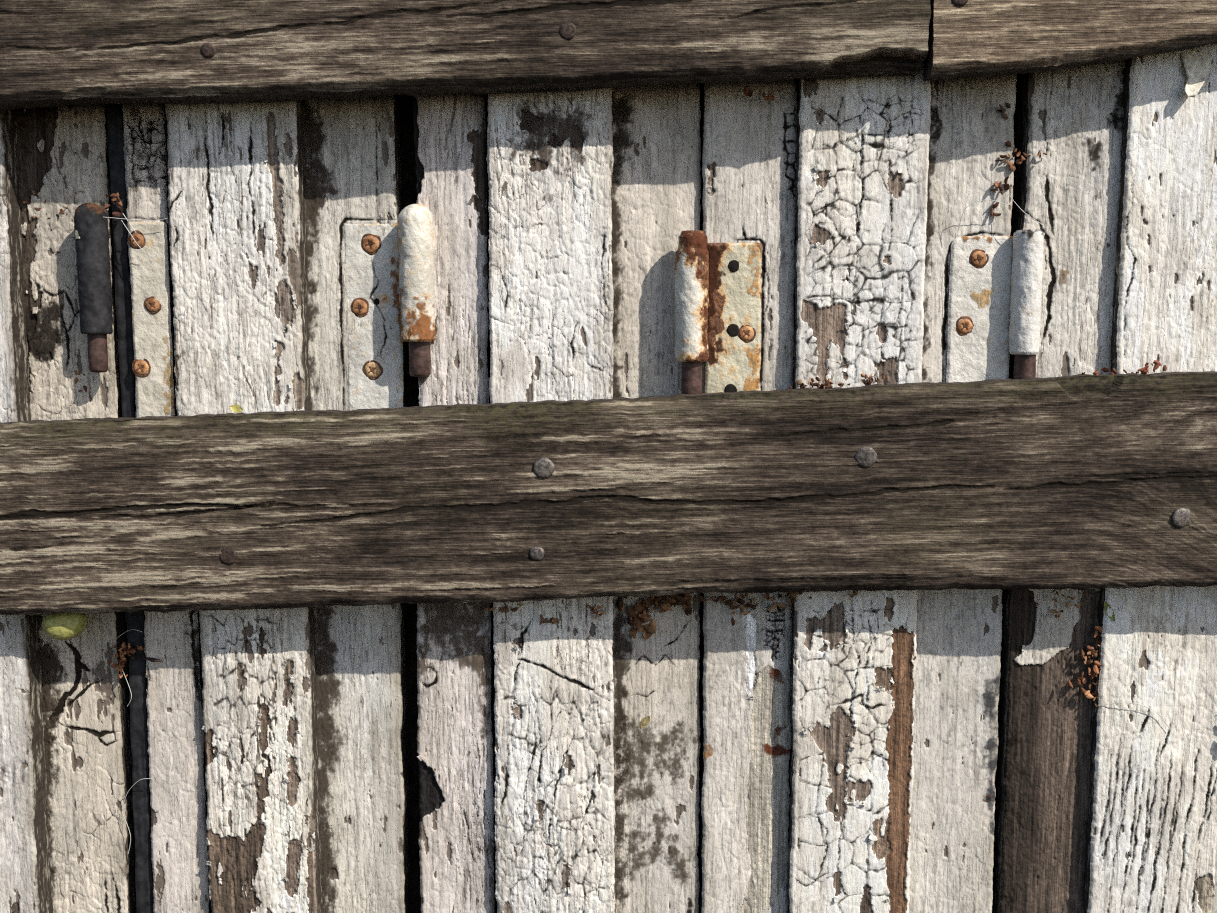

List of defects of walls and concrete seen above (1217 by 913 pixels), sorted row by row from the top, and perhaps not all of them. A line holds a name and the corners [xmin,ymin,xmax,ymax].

rust [390,257,436,342]
rust [681,230,726,365]
crack [734,227,770,391]
rust [744,344,760,391]
rust [743,243,762,301]
crack [783,95,1003,382]
crack [1025,176,1056,338]
peeling [206,659,317,913]
crack [464,618,606,913]
peeling [740,614,873,913]
peeling [860,597,916,913]
peeling [999,588,1101,913]